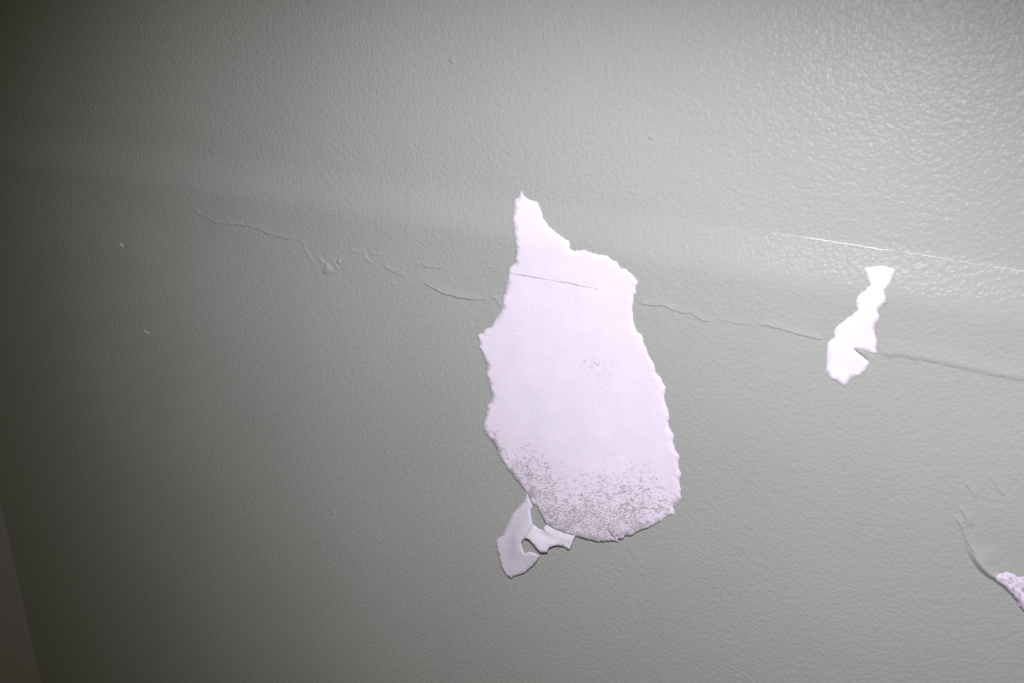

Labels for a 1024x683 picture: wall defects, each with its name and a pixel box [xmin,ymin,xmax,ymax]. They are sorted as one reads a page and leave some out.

peeling [476,190,683,579]
crack [510,273,825,340]
peeling [824,263,897,386]
crack [775,233,1024,272]